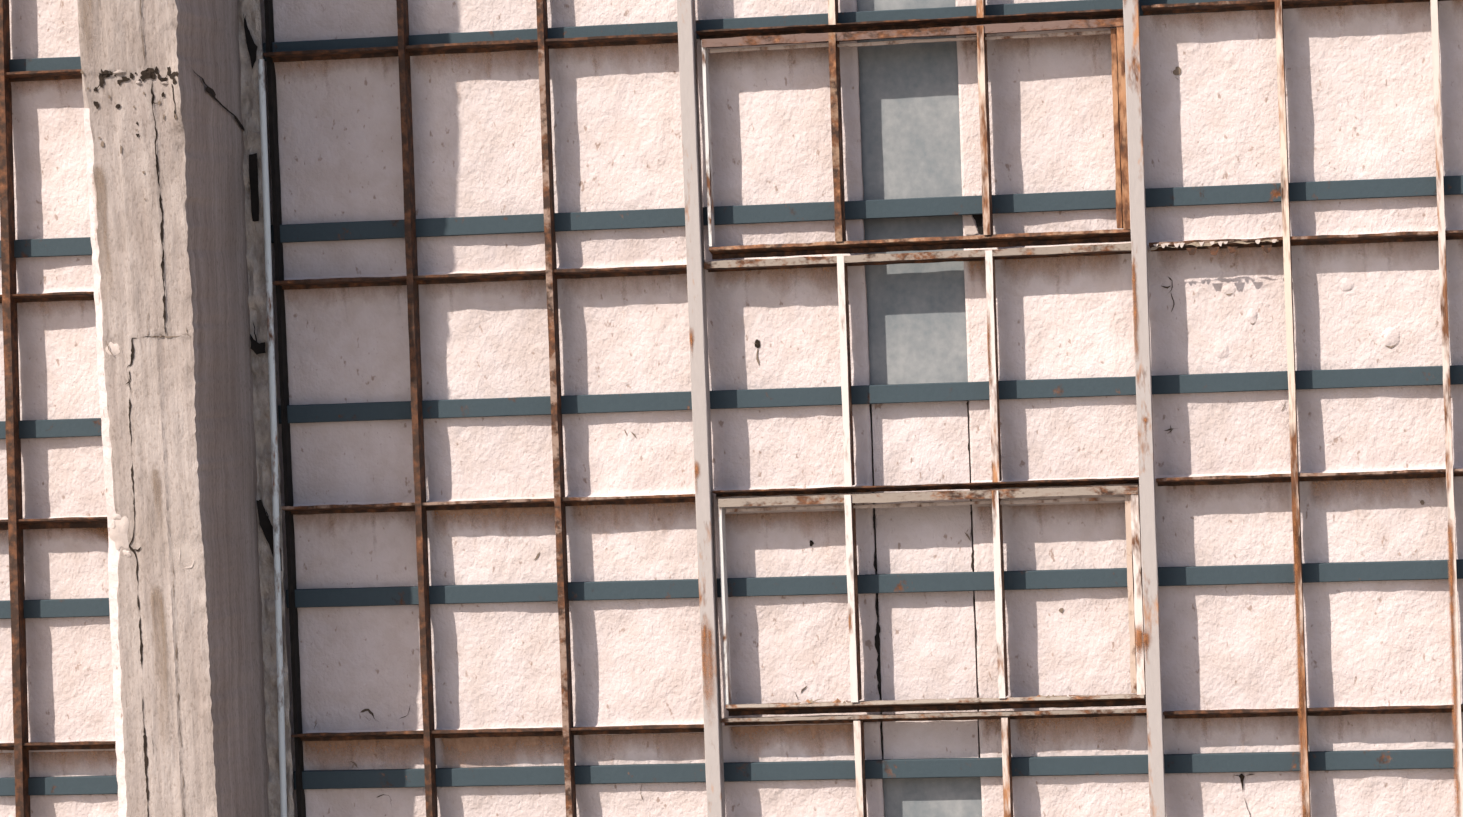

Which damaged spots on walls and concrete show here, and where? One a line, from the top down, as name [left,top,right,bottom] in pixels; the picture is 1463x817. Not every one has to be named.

spalling [80,66,179,137]
peeling [1149,239,1278,255]
crack [125,0,254,817]
corrosion [702,626,711,684]